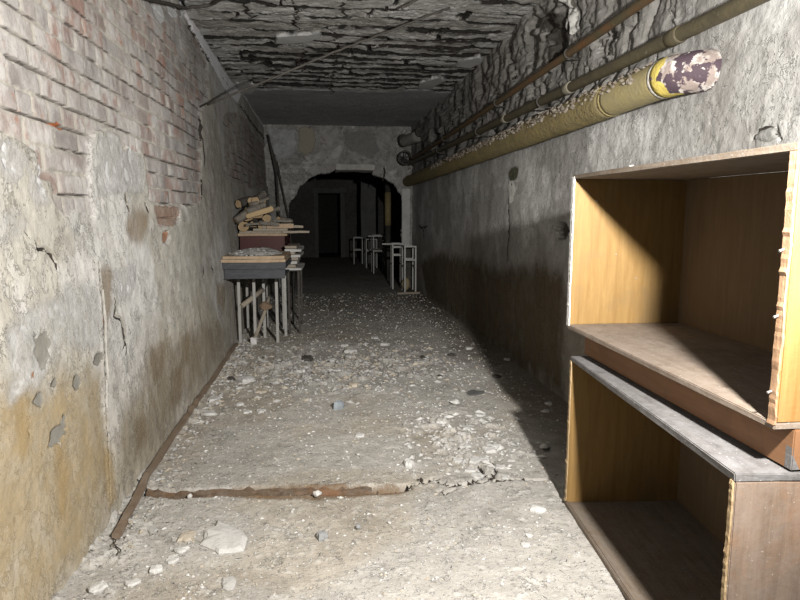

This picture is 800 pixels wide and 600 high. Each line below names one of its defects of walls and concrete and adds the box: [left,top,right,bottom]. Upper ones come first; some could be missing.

crack [291,0,303,30]
crack [328,2,348,94]
peeling [0,141,48,204]
peeling [97,131,145,199]
spalling [154,206,180,242]
crack [25,233,58,269]
peeling [8,292,103,400]
crack [98,263,127,407]
spalling [48,413,68,448]
corrosion [234,484,410,500]
crack [377,463,533,496]